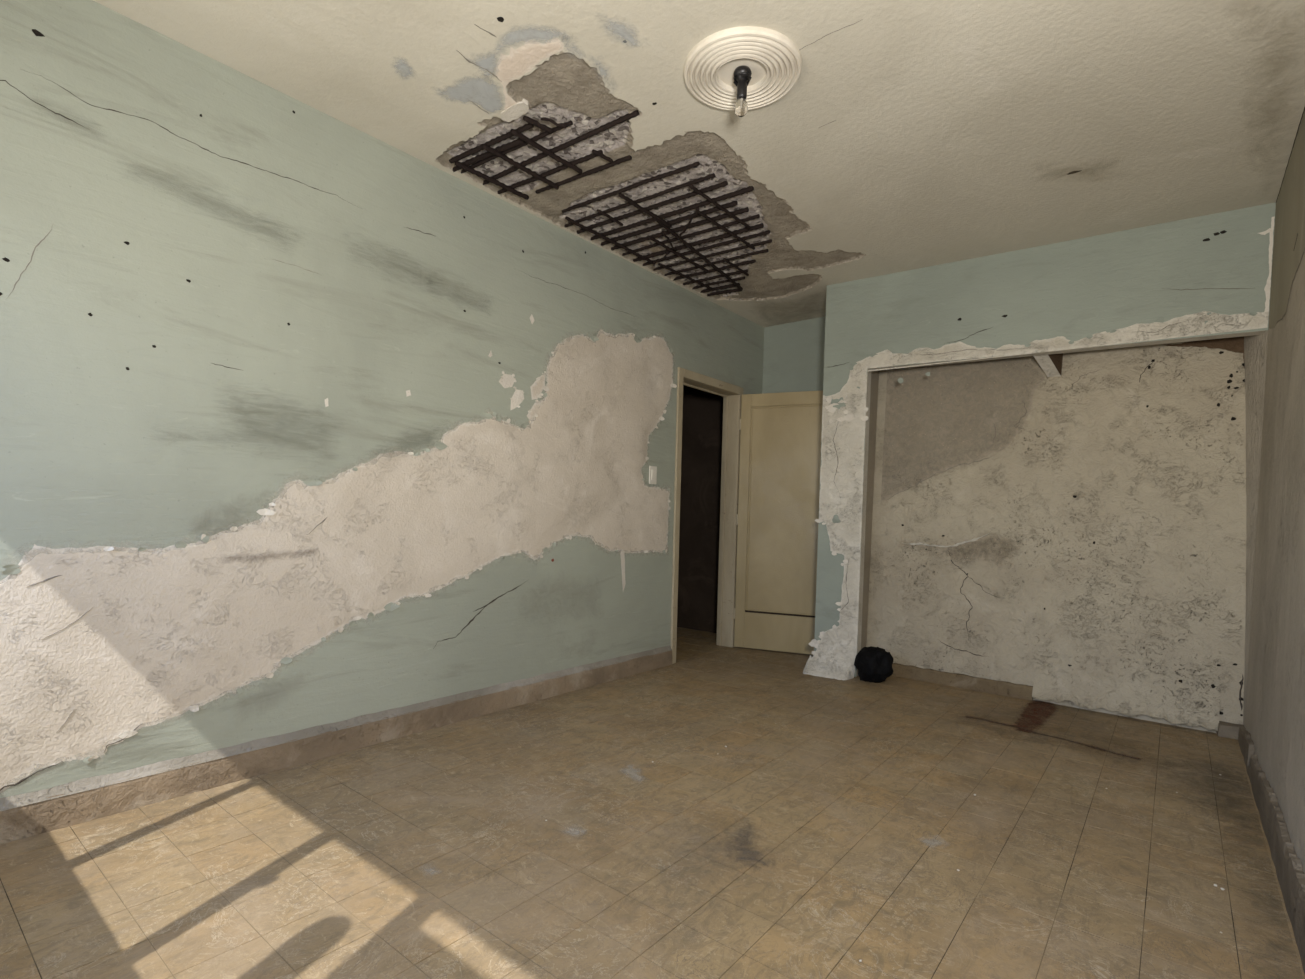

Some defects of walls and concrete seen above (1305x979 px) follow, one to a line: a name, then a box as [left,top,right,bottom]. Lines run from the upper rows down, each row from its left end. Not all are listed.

crack [0,69,348,202]
spalling [435,38,866,301]
crack [7,229,52,298]
peeling [803,111,1305,680]
peeling [0,329,677,793]
crack [435,582,525,646]
crack [939,551,996,656]